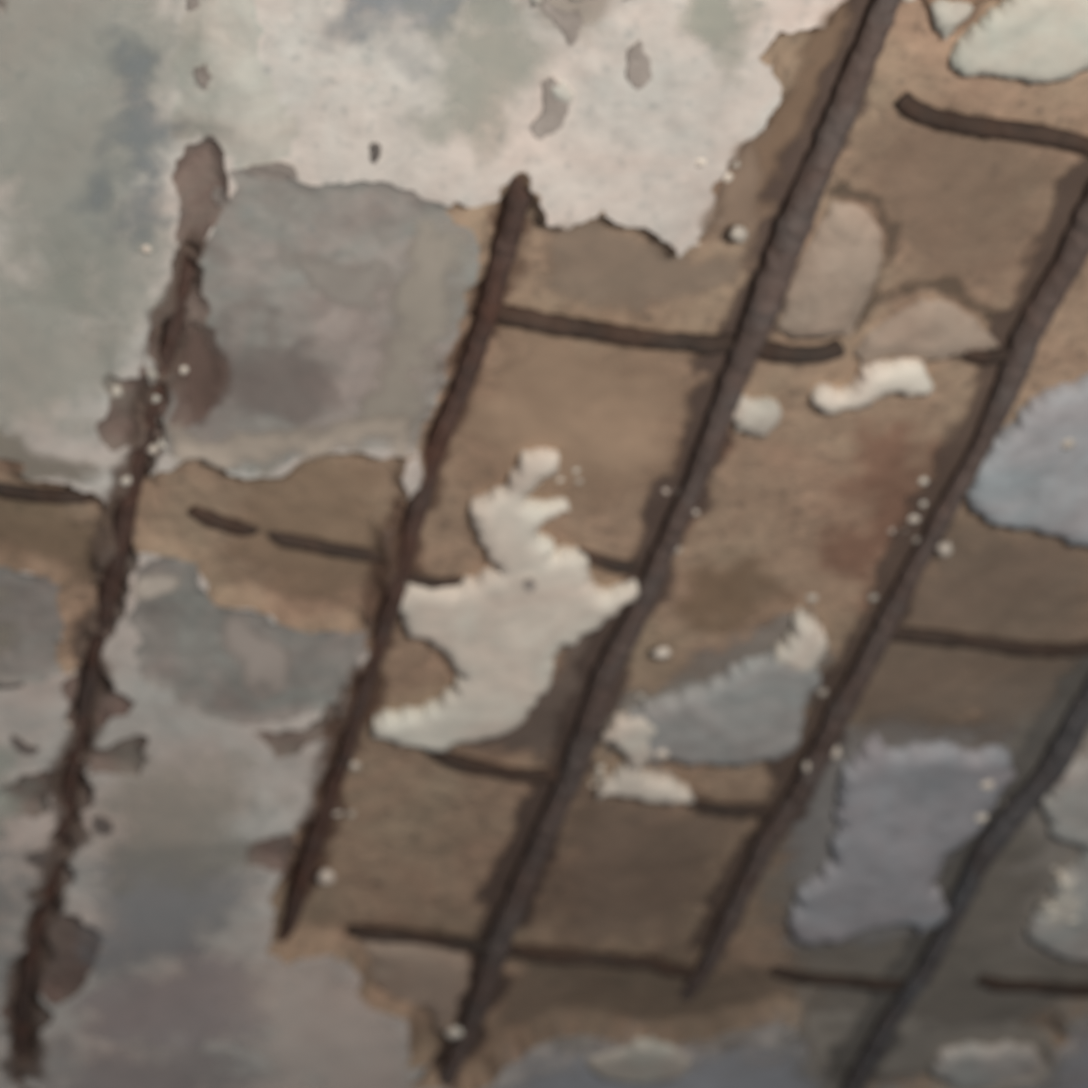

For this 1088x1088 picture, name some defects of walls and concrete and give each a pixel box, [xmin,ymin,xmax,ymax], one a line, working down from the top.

spalling [195,64,212,90]
water stain [346,0,459,29]
corrosion [704,0,873,339]
corrosion [990,158,1088,349]
water stain [0,434,89,481]
corrosion [1,327,229,1081]
peeling [0,135,777,1060]
corrosion [549,603,631,768]
spalling [266,0,1088,1088]
corrosion [626,352,730,585]
corrosion [689,363,1003,947]
water stain [907,820,1088,1036]